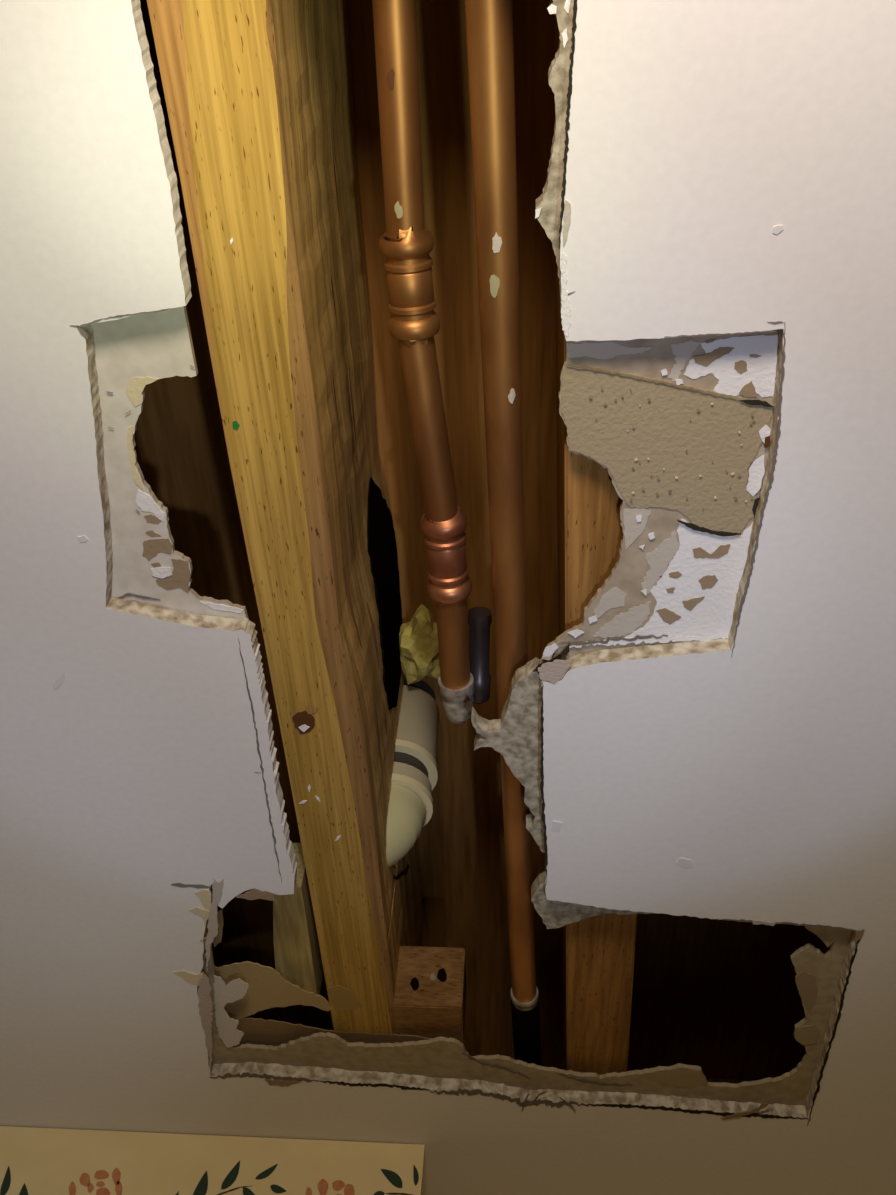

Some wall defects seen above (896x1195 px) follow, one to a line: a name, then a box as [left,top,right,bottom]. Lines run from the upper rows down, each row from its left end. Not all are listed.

peeling [547,0,571,14]
peeling [561,200,571,336]
peeling [746,425,771,496]
peeling [568,615,597,638]
spalling [538,643,571,684]
spalling [173,879,224,1076]